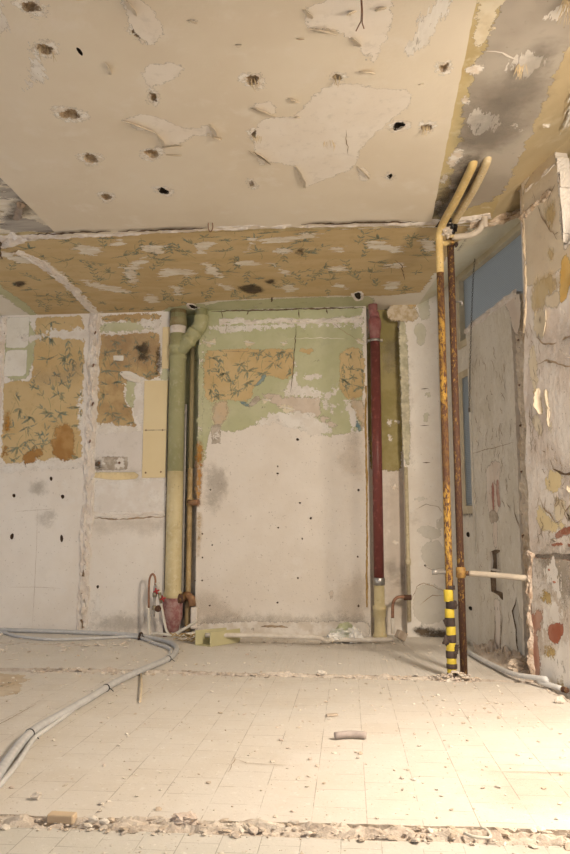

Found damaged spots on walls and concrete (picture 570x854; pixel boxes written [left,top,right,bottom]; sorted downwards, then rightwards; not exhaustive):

spalling [10,0,50,20]
spalling [29,39,60,62]
spalling [51,106,90,123]
peeling [122,62,222,162]
spalling [238,72,265,91]
peeling [246,72,438,189]
peeling [296,0,393,74]
peeling [440,0,570,213]
peeling [0,182,48,234]
spalling [151,186,174,197]
peeling [96,291,419,607]
peeling [464,152,570,675]